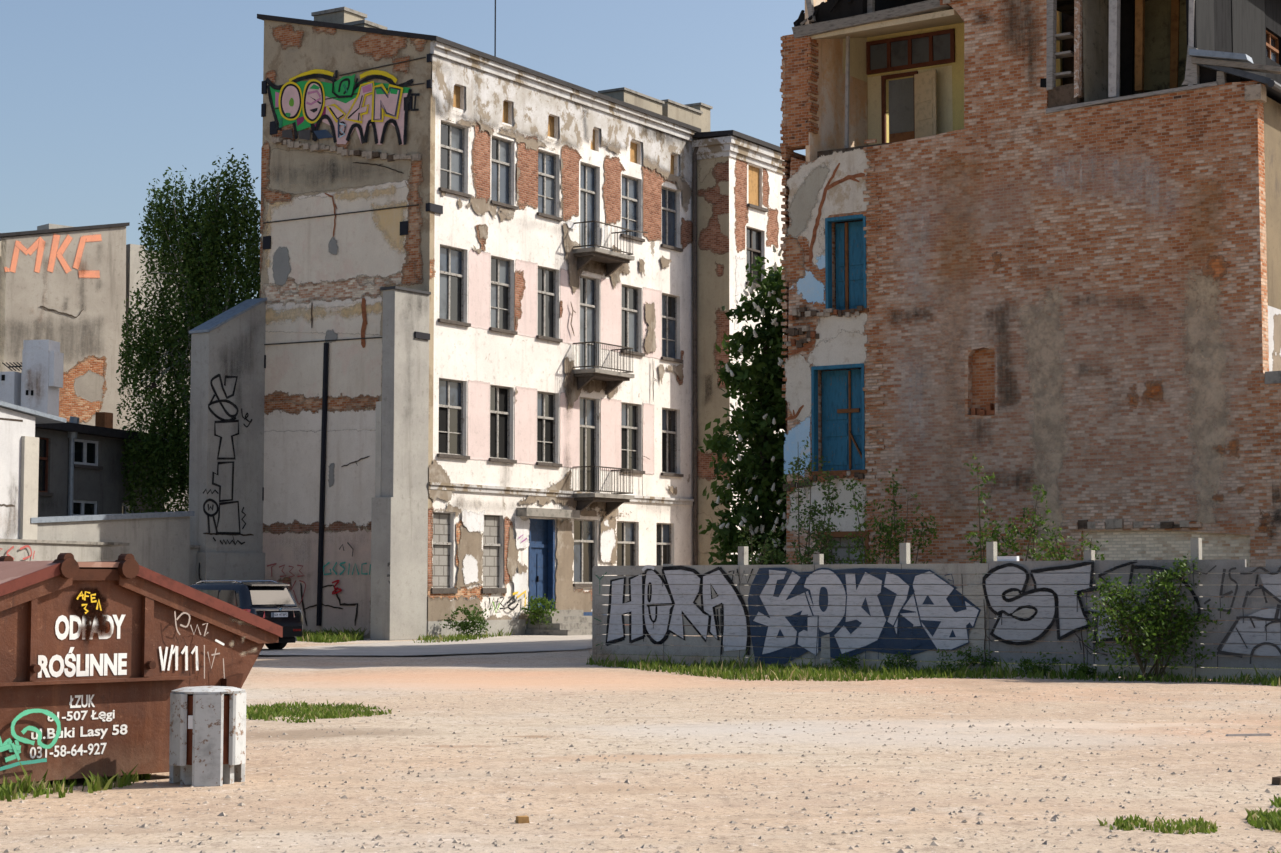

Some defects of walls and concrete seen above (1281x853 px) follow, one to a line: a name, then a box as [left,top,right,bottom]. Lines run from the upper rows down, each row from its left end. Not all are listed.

flaking render [272,24,336,50]
flaking render [260,124,436,306]
flaking render [353,32,825,389]
peeling [807,329,868,366]
flaking render [59,355,107,423]
flaking render [264,390,379,415]
flaking render [263,519,371,535]
flaking render [428,459,631,624]